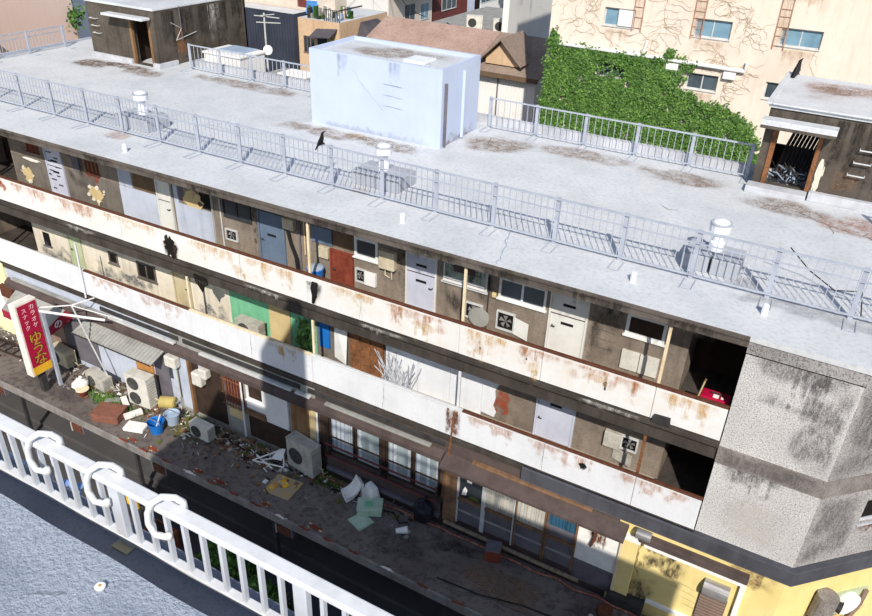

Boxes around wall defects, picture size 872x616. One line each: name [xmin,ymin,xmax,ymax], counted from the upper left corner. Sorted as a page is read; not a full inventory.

corrosion [350,333,384,378]
corrosion [494,392,510,415]
leakage [764,362,846,463]
leakage [639,557,680,578]